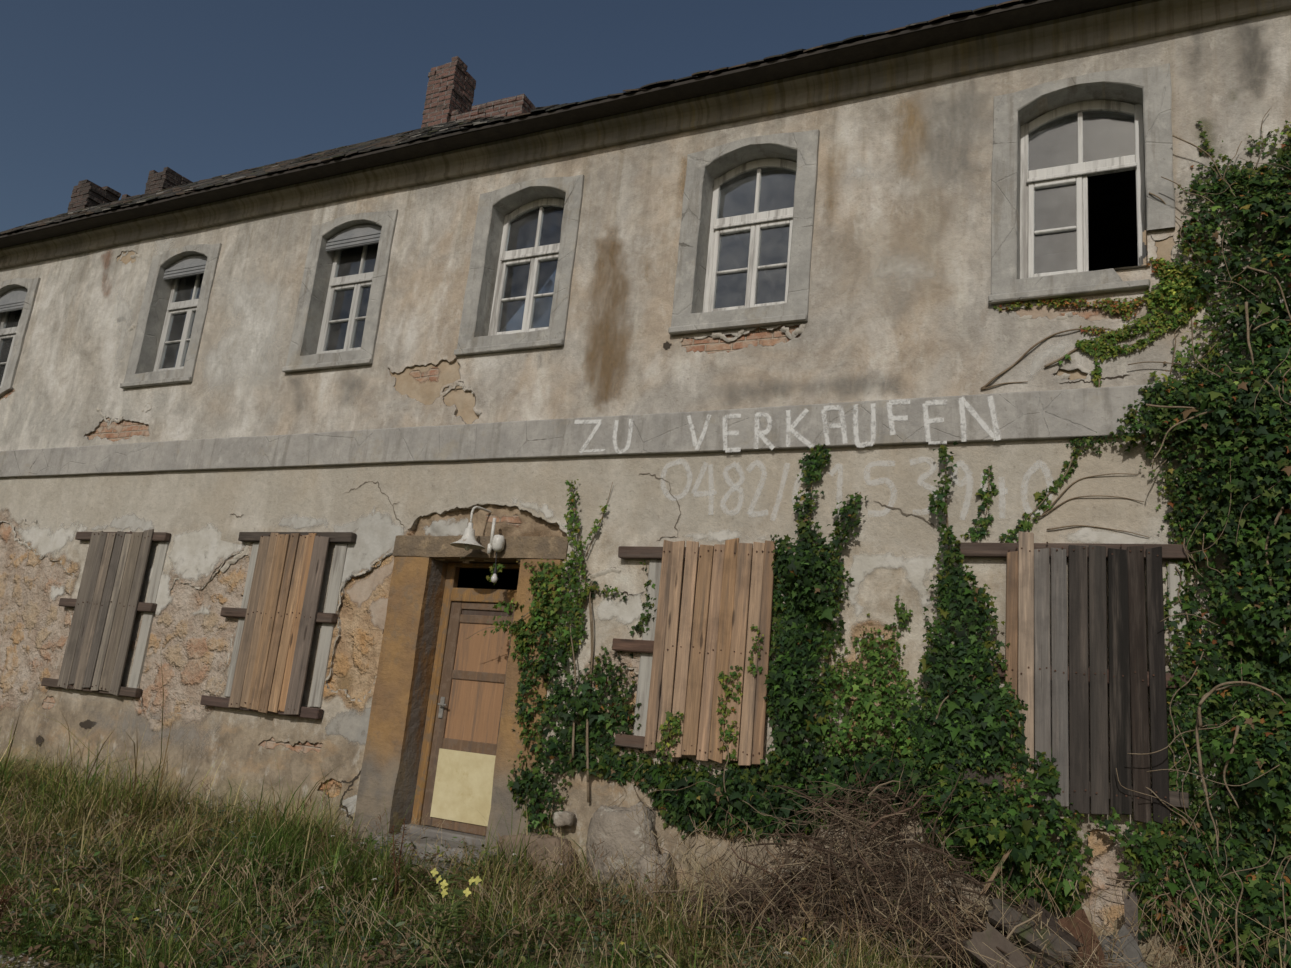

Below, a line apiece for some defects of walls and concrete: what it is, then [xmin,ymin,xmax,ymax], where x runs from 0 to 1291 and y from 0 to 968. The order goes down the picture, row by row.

flaking render [83,402,152,444]
flaking render [387,356,483,424]
flaking render [678,322,809,357]
flaking render [0,509,80,713]
flaking render [131,542,253,731]
flaking render [323,549,417,711]
crack [337,481,404,611]
flaking render [404,501,572,560]